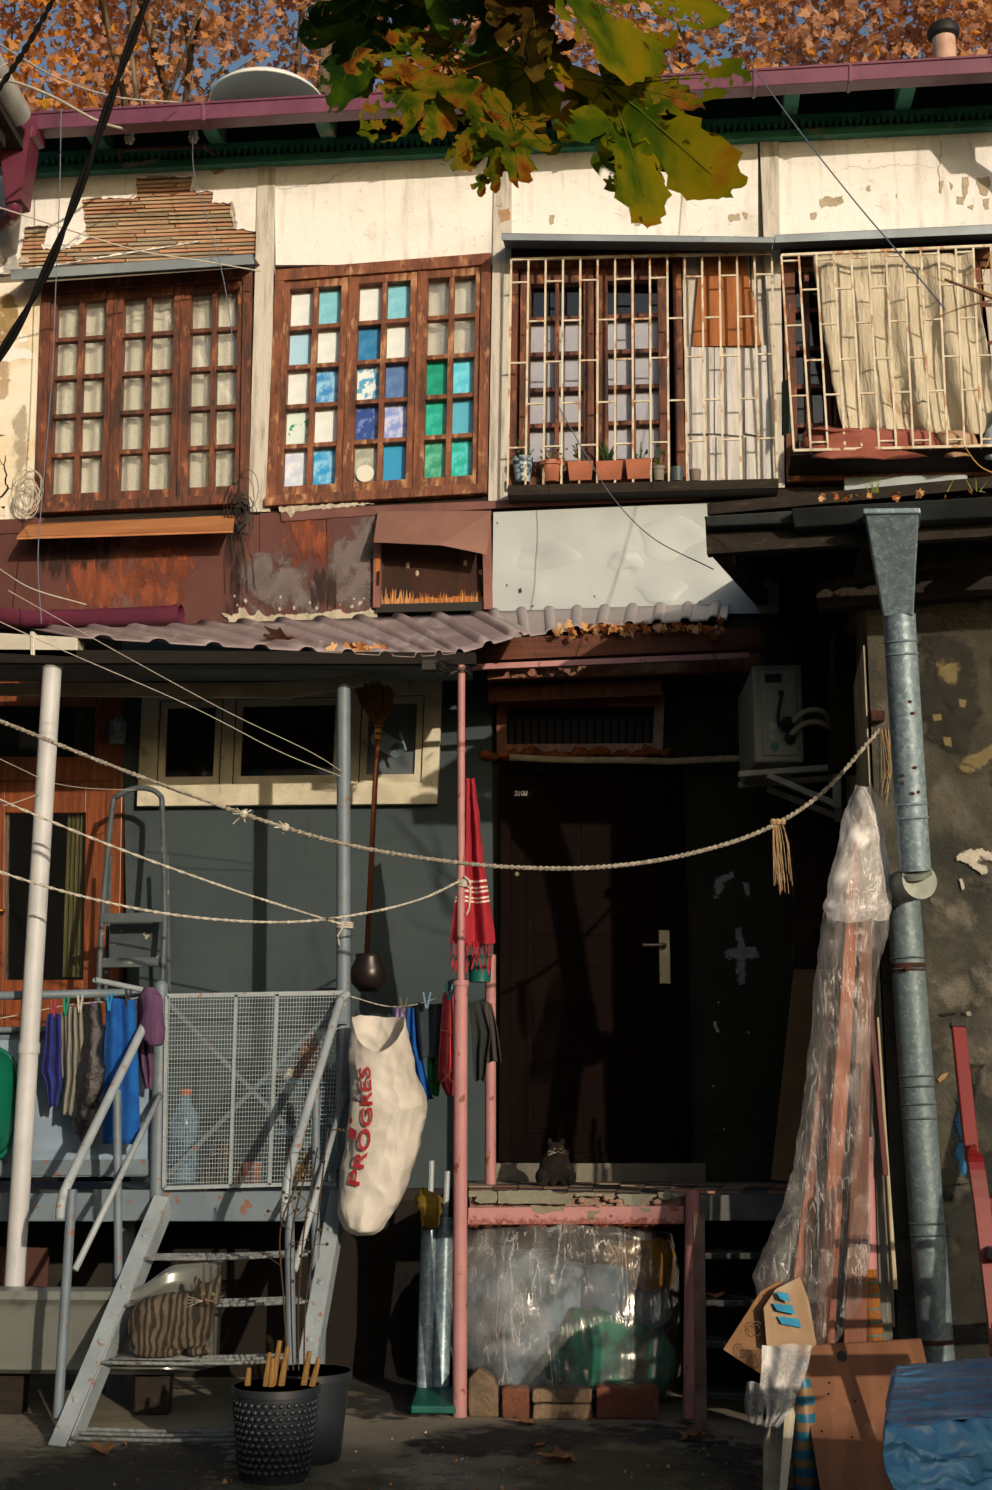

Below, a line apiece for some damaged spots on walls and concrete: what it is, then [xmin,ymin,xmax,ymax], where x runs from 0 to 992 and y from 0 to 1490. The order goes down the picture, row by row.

flaking render [18,159,256,266]
peeling [939,176,991,210]
corrosion [67,541,194,609]
corrosion [235,515,382,615]
damp [917,634,992,773]
damp [932,848,992,926]
damp [939,970,992,1005]